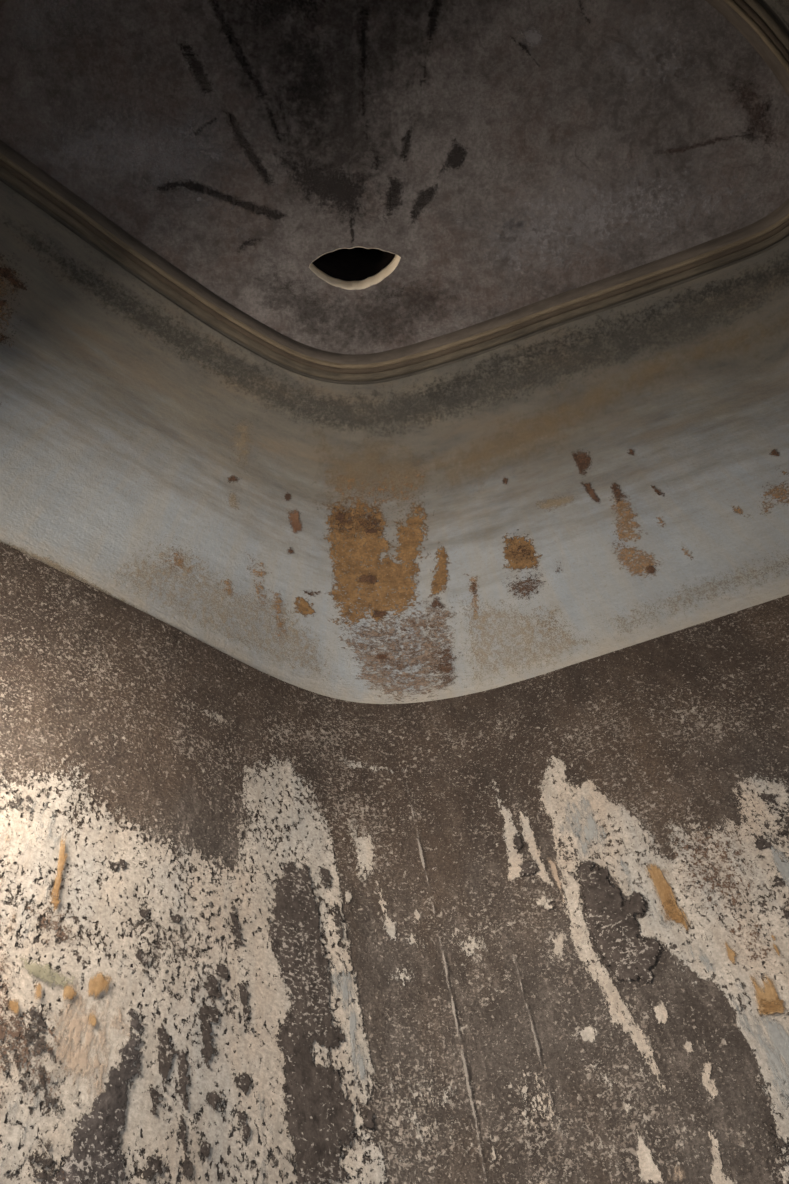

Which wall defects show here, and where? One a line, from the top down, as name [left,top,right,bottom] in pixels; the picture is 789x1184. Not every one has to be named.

rust [247,460,463,702]
rust [466,575,479,619]
rust [502,533,544,600]
rust [571,449,661,578]
peeling [0,753,462,1184]
peeling [444,929,496,966]
peeling [492,755,789,1184]